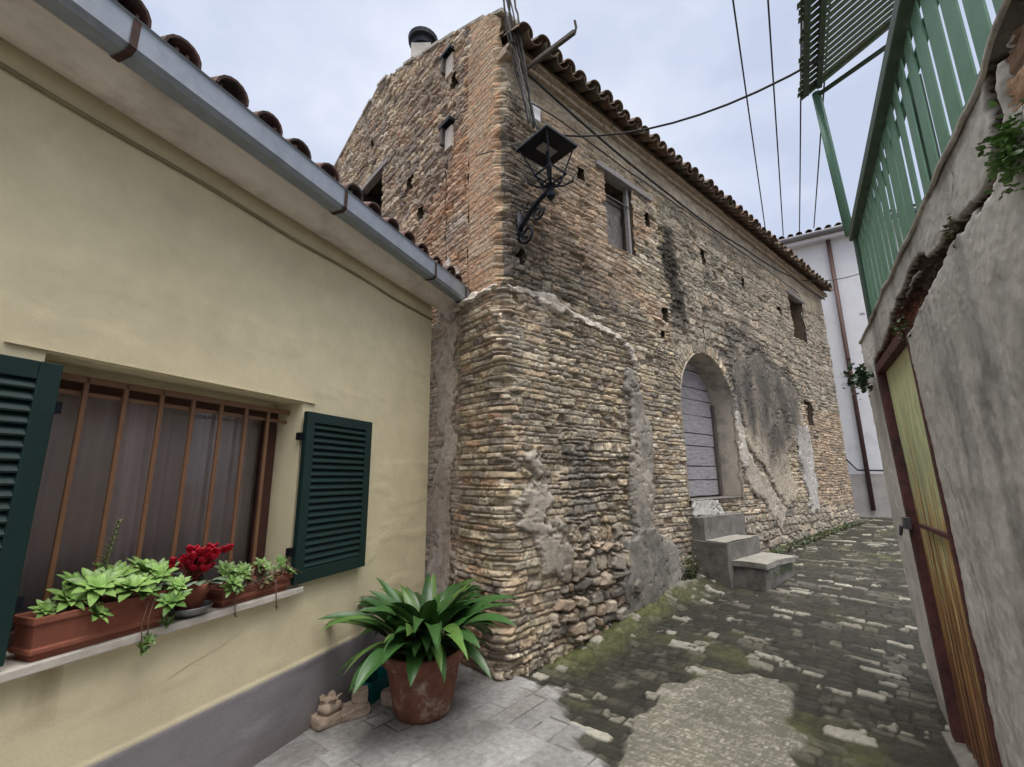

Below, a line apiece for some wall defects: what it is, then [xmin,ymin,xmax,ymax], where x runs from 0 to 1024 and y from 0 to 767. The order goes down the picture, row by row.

damp [663,228,686,326]
spalling [425,284,689,646]
peeling [731,349,820,529]